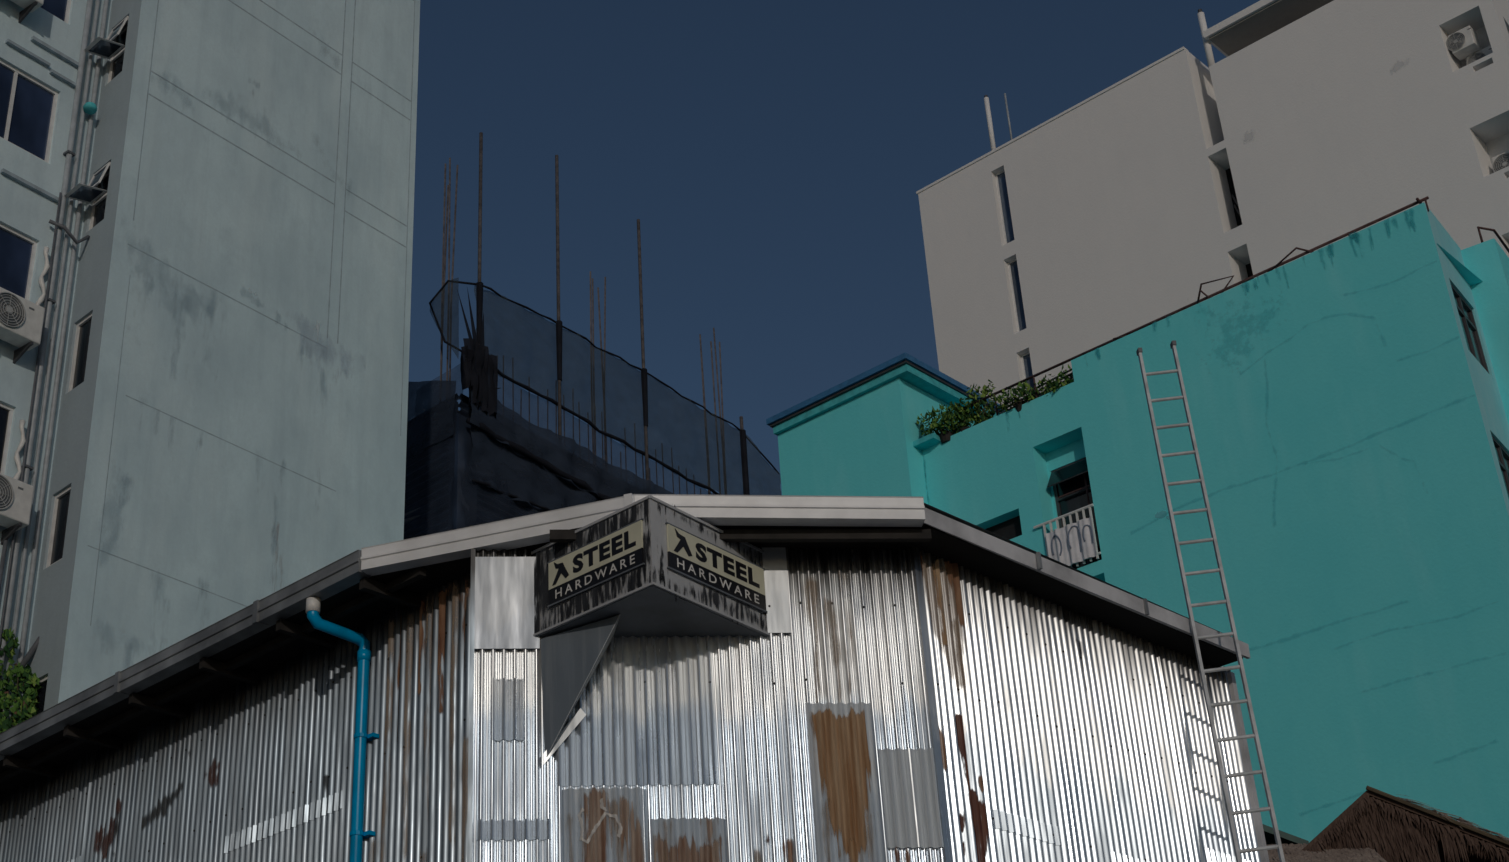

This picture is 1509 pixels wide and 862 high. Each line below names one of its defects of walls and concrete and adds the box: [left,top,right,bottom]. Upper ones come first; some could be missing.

rust [920,554,966,688]
rust [94,799,121,859]
rust [569,787,722,862]
rust [806,580,871,862]
rust [895,847,911,862]
rust [939,714,990,862]